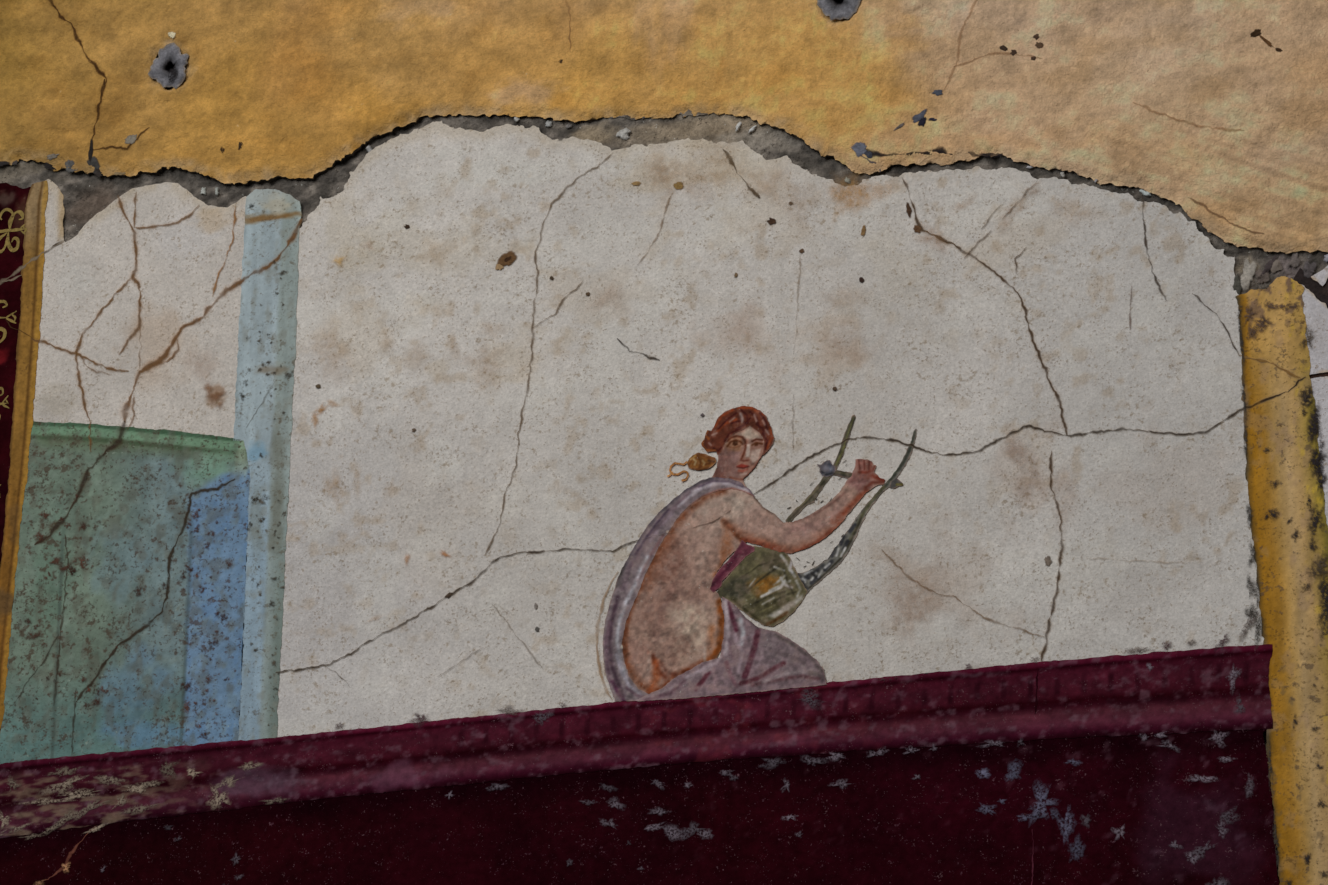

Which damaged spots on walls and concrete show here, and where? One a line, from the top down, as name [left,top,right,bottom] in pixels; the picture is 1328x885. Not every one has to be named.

crack [50,0,150,150]
flaking render [1251,29,1282,52]
crack [640,196,671,262]
flaking render [0,109,1328,362]
crack [0,191,302,752]
crack [276,154,639,673]
crack [694,148,1328,713]
peeling [1246,387,1328,635]
peeling [1216,543,1262,648]
peeling [0,762,199,839]
peeling [646,808,712,839]
peeling [1019,786,1090,858]